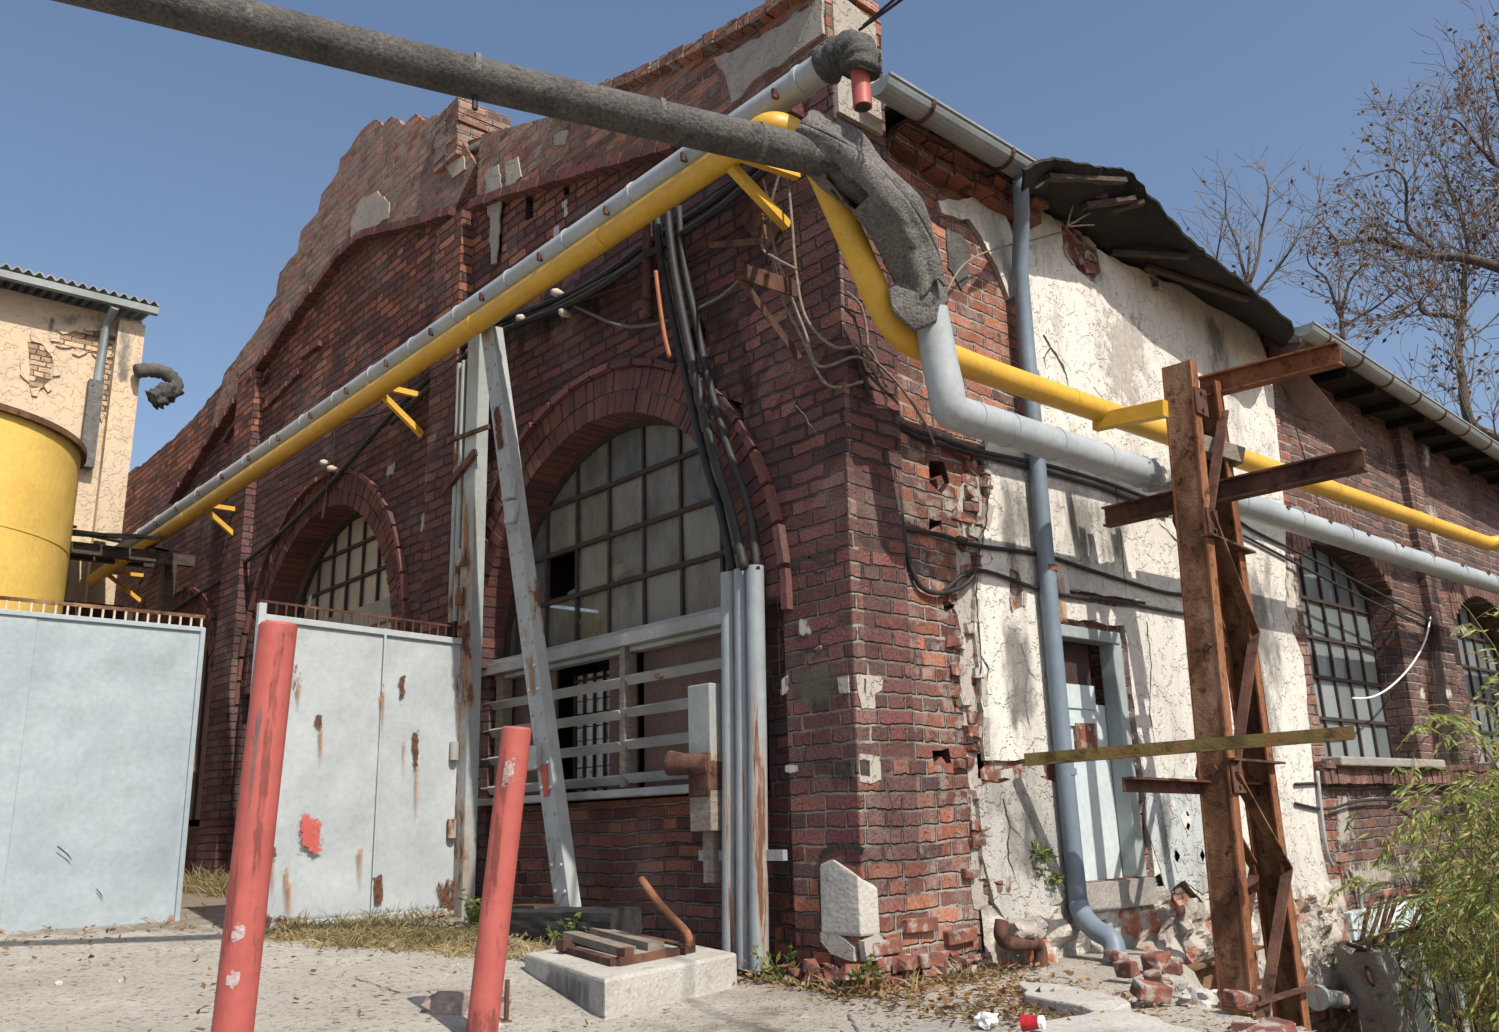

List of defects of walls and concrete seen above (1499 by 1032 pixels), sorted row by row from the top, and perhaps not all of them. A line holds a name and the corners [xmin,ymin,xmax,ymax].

flaking render [1061,221,1102,283]
corrosion [380,675,406,711]
corrosion [453,620,472,723]
spalling [929,440,1056,911]
corrosion [315,714,323,747]
corrosion [403,731,419,792]
corrosion [265,847,296,928]
corrosion [372,874,383,903]